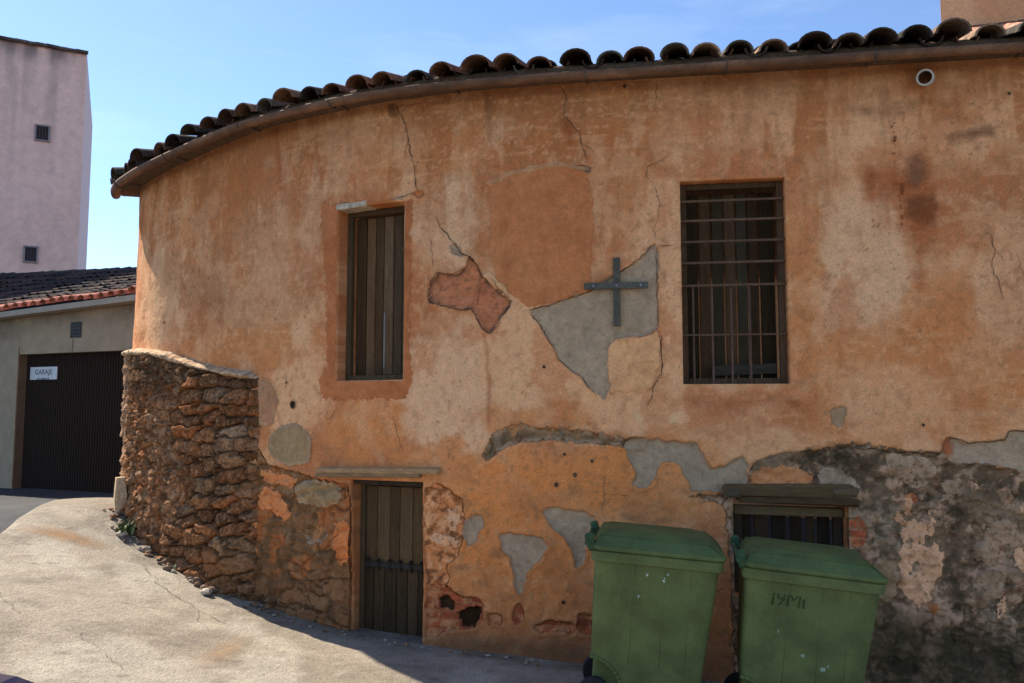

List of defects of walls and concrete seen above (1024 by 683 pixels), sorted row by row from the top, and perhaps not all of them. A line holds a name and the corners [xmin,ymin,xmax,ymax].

crack [396,105,417,198]
crack [558,84,597,160]
spalling [428,243,511,333]
crack [428,156,673,404]
peeling [482,422,644,461]
spalling [252,450,351,631]
spalling [423,483,484,639]
spalling [499,532,592,634]
spalling [543,507,595,569]
spalling [689,493,739,672]
spalling [747,441,1024,683]